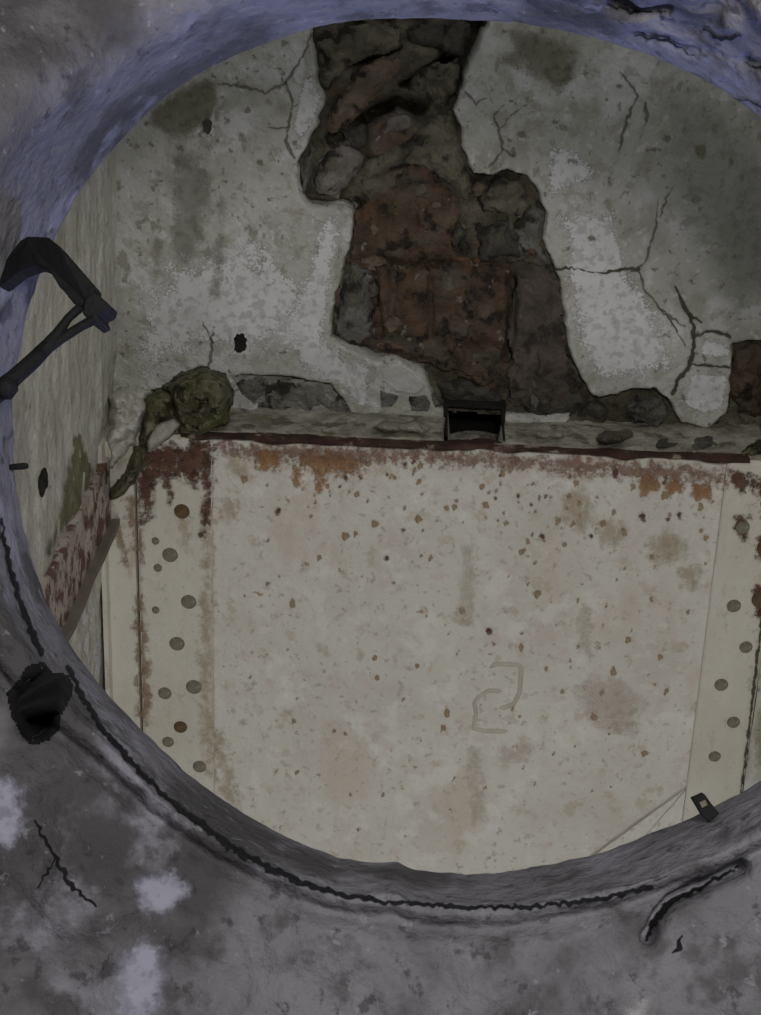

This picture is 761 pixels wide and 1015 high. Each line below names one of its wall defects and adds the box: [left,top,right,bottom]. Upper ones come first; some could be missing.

damp [153,80,216,133]
crack [217,35,311,159]
spalling [298,18,679,445]
crack [555,190,733,395]
spalling [234,375,350,412]
rust [117,439,761,564]
spalling [656,438,677,449]
spalling [692,340,761,456]
rust [132,594,152,722]
rust [751,584,761,618]